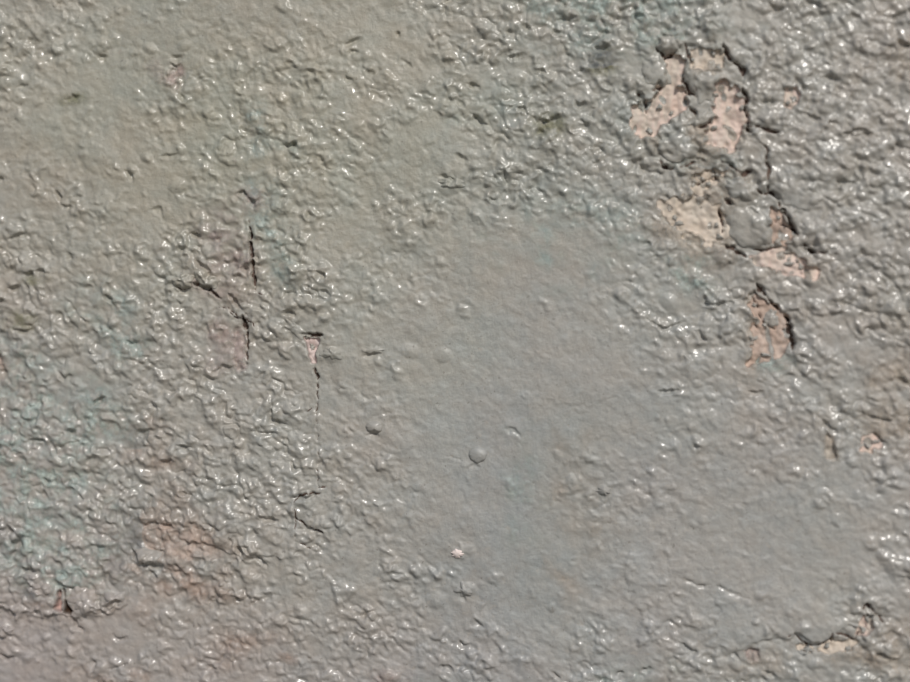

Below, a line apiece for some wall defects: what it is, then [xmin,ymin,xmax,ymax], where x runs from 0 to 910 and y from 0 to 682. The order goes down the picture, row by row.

spalling [629,36,844,281]
crack [722,45,837,254]
crack [249,221,262,295]
spalling [745,294,789,367]
crack [756,284,795,349]